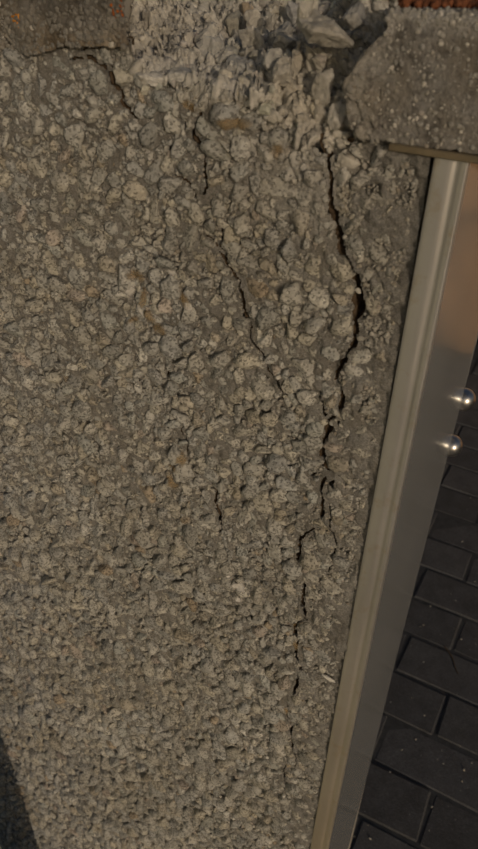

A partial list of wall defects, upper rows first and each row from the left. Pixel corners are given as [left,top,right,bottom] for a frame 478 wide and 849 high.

crack [72,36,138,119]
spalling [126,0,398,171]
crack [176,112,208,197]
crack [207,228,283,398]
crack [296,133,366,570]
crack [212,483,222,531]
crack [293,582,307,690]